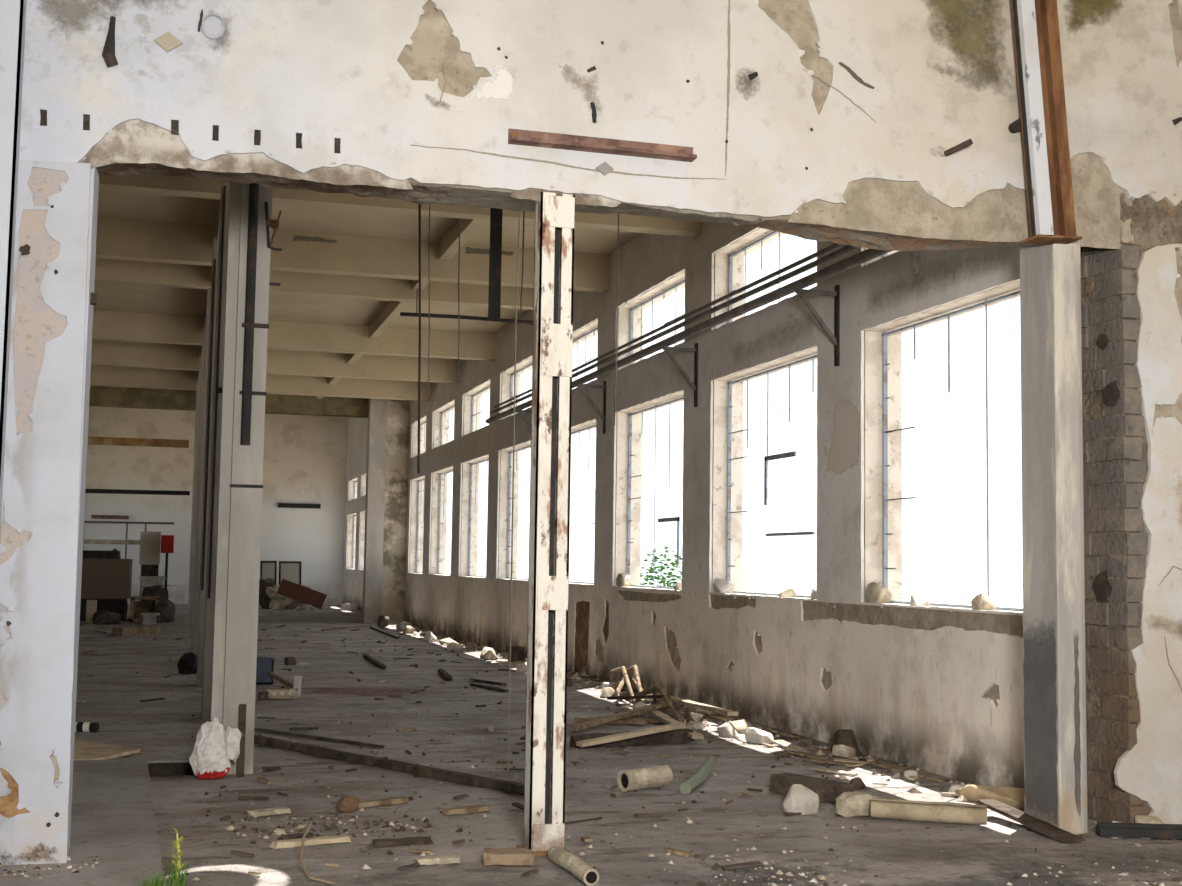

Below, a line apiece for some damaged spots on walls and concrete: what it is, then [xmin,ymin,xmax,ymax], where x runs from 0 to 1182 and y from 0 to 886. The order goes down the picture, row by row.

water stain [45,0,120,26]
flaking render [397,0,513,106]
flaking render [752,0,832,114]
water stain [929,0,1001,87]
water stain [1069,0,1120,28]
flaking render [79,119,413,189]
flaking render [510,185,622,207]
flaking render [788,173,1031,242]
peeling [13,167,69,436]
flaking render [1070,153,1182,823]
crack [1164,636,1182,691]
peeling [0,766,30,818]